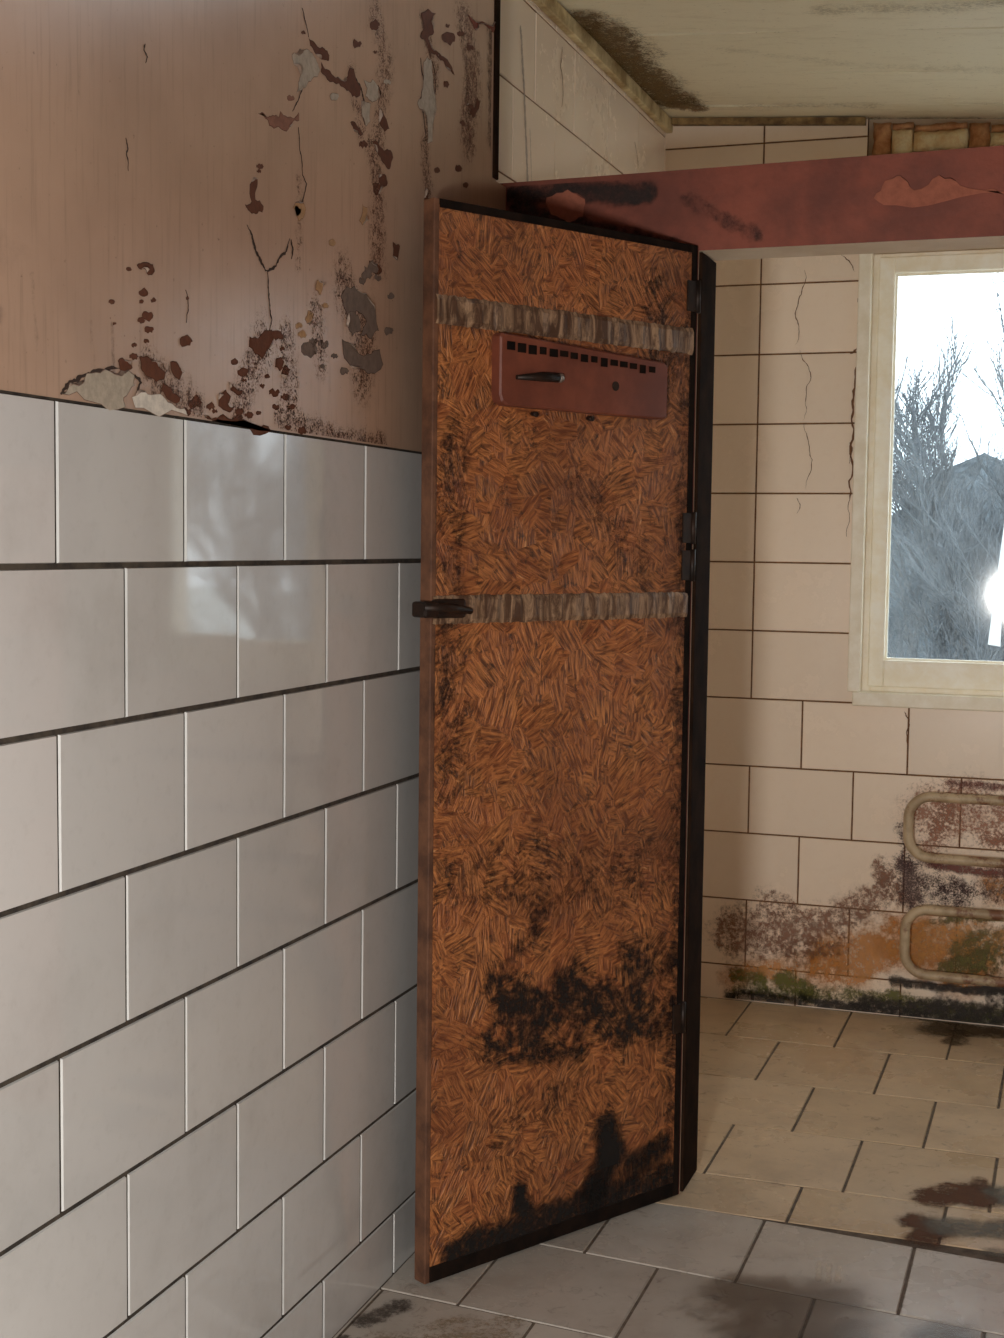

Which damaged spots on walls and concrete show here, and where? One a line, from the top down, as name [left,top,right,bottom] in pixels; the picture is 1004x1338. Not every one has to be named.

peeling [417,6,495,200]
mould [570,11,709,112]
peeling [62,0,400,445]
crack [795,273,812,513]
crack [846,348,857,537]
water stain [441,835,680,1262]
water stain [714,823,1004,964]
corrosion [726,916,1004,987]
water stain [851,976,1004,1023]
corrosion [906,780,1004,902]
water stain [899,1179,1004,1256]